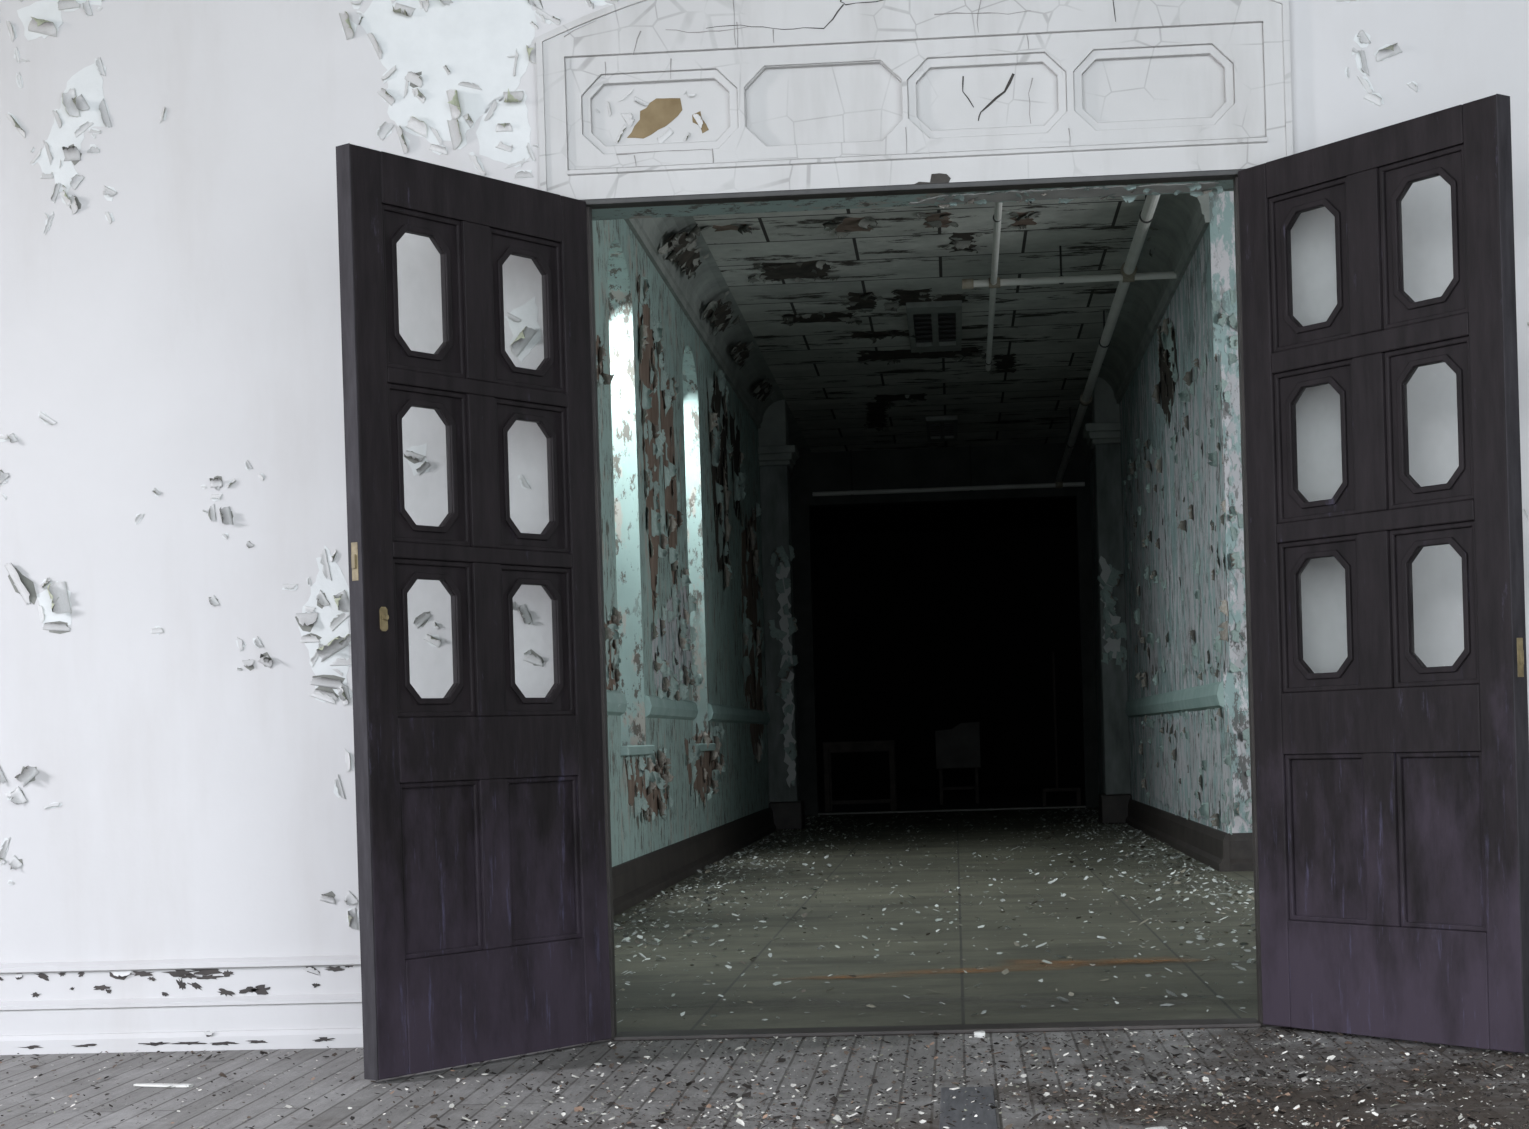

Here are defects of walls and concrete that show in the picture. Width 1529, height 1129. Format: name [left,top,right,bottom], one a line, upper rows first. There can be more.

peeling [6,57,112,235]
peeling [339,0,561,179]
peeling [595,89,709,144]
crack [616,149,714,163]
crack [605,0,883,78]
crack [934,0,1033,124]
peeling [908,173,1223,254]
peeling [1097,285,1248,691]
peeling [4,563,72,634]
peeling [282,546,353,705]
peeling [1138,705,1252,834]
spalling [0,969,270,997]